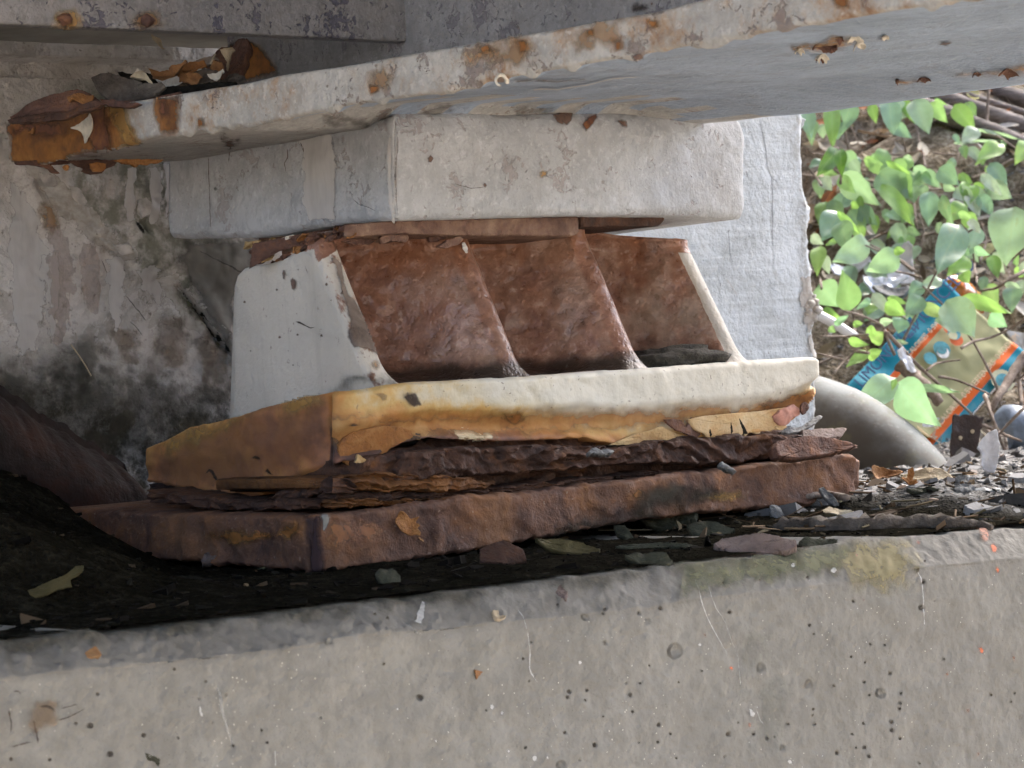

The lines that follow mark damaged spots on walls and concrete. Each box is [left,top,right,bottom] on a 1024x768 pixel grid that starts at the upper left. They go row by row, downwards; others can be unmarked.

corrosion [244,42,276,80]
corrosion [464,27,532,64]
corrosion [574,21,623,51]
corrosion [369,69,389,94]
peeling [71,114,93,143]
corrosion [6,89,179,175]
corrosion [332,258,379,368]
corrosion [145,389,857,572]